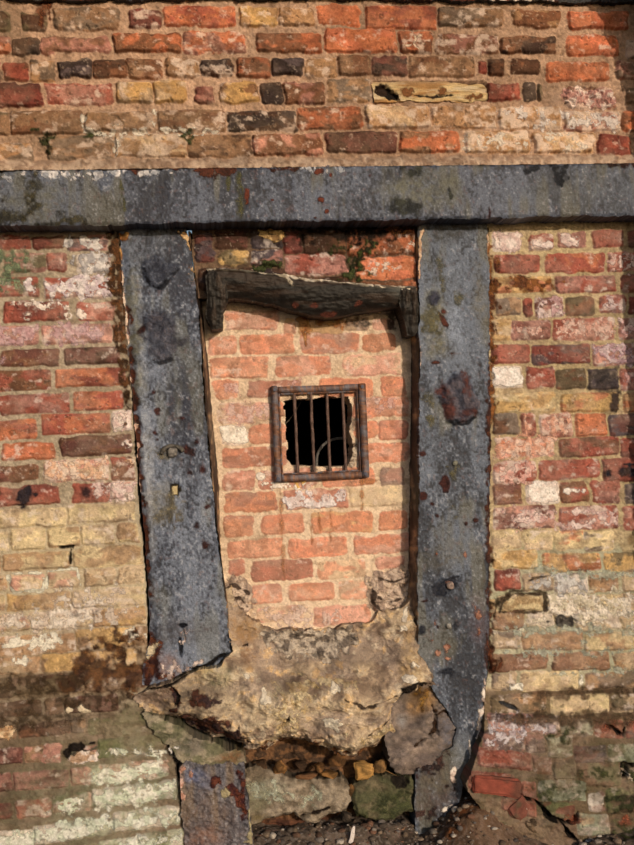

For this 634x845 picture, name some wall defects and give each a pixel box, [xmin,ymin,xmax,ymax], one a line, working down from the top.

spalling [225,574,257,618]
spalling [364,564,410,613]
leakage [0,567,139,731]
crack [173,653,227,679]
leakage [0,746,182,845]
crack [503,796,576,840]